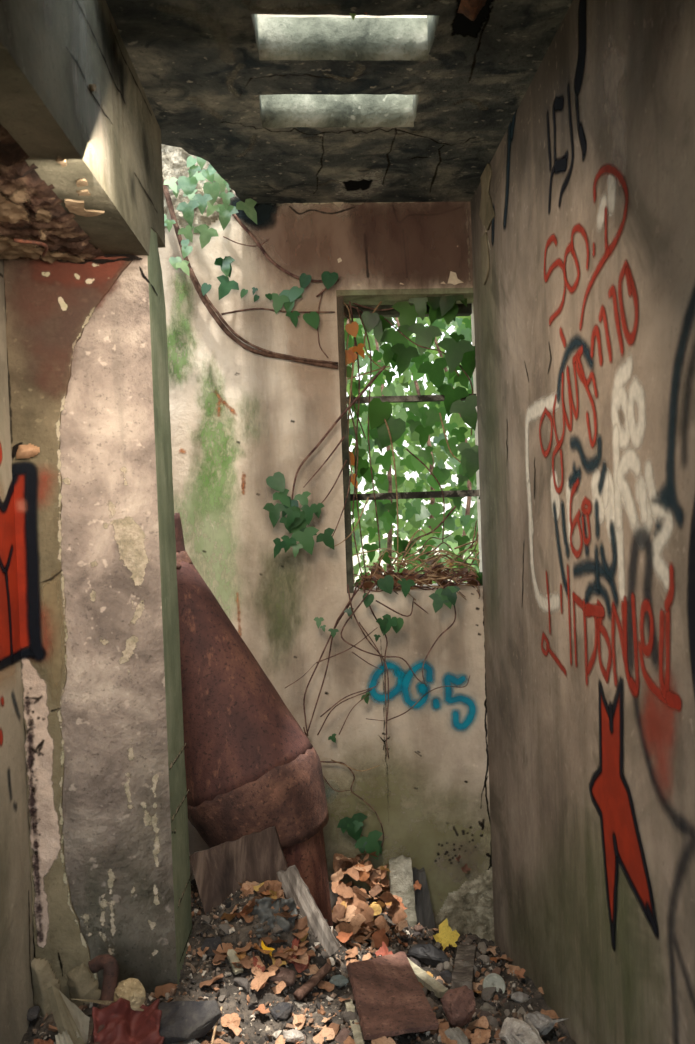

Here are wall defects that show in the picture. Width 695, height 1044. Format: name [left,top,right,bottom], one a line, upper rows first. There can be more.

crack [66,1,152,122]
crack [243,0,338,14]
crack [159,5,477,194]
spalling [451,0,494,38]
water stain [202,372,224,416]
peeling [0,124,133,1000]
peeling [103,501,150,586]
peeling [119,600,145,678]
peeling [124,739,160,868]